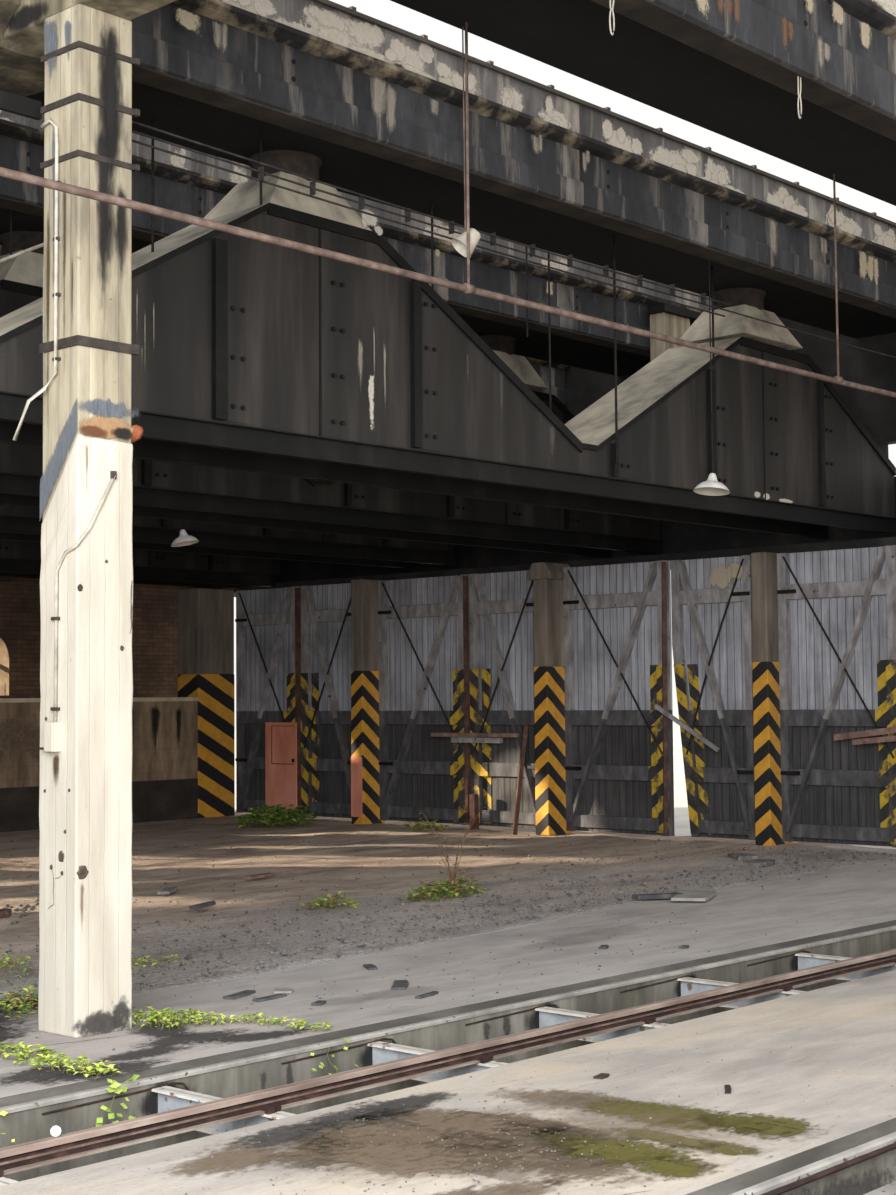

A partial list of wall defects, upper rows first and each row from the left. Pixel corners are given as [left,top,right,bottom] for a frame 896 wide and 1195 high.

peeling [222,0,477,95]
peeling [501,87,523,112]
peeling [538,96,571,129]
leakage [97,31,127,279]
peeling [602,120,744,194]
peeling [766,187,808,217]
peeling [362,210,383,235]
peeling [423,223,460,242]
peeling [825,205,896,250]
leakage [434,1180,558,1195]